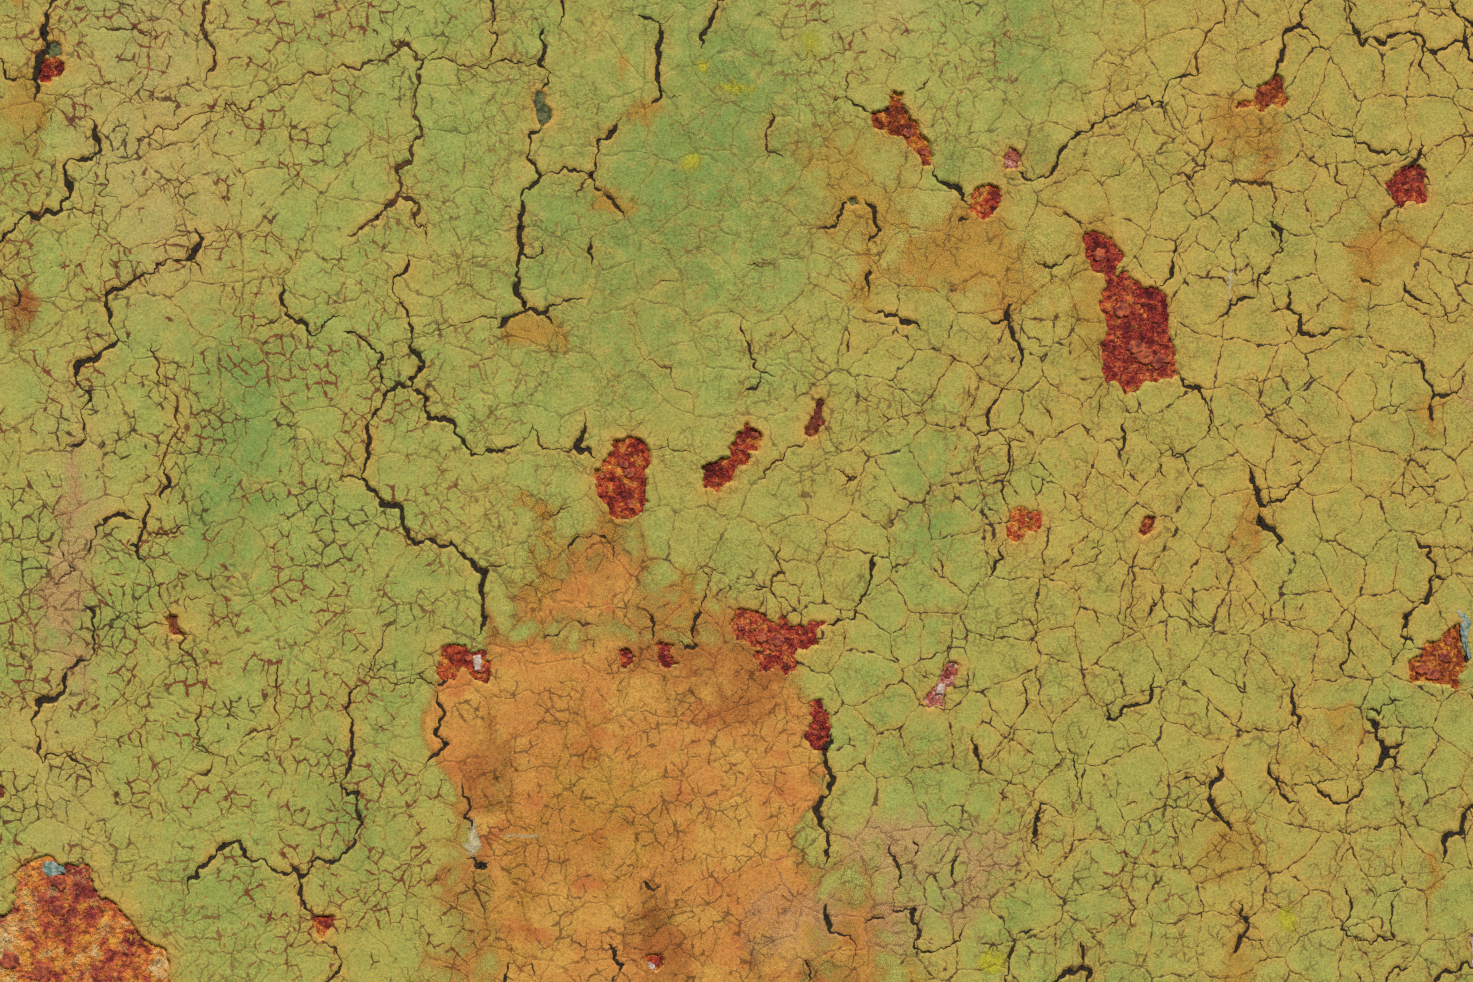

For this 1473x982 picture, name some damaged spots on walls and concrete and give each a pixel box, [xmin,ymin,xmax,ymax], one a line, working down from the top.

crack [1274,0,1473,84]
crack [137,0,724,638]
crack [980,0,1227,581]
crack [1174,124,1353,337]
crack [0,118,281,782]
crack [1247,402,1339,557]
crack [185,623,450,982]
rust [421,492,889,982]
crack [800,733,972,982]
peeling [924,662,958,708]
crack [1267,677,1412,805]
crack [1335,804,1473,982]